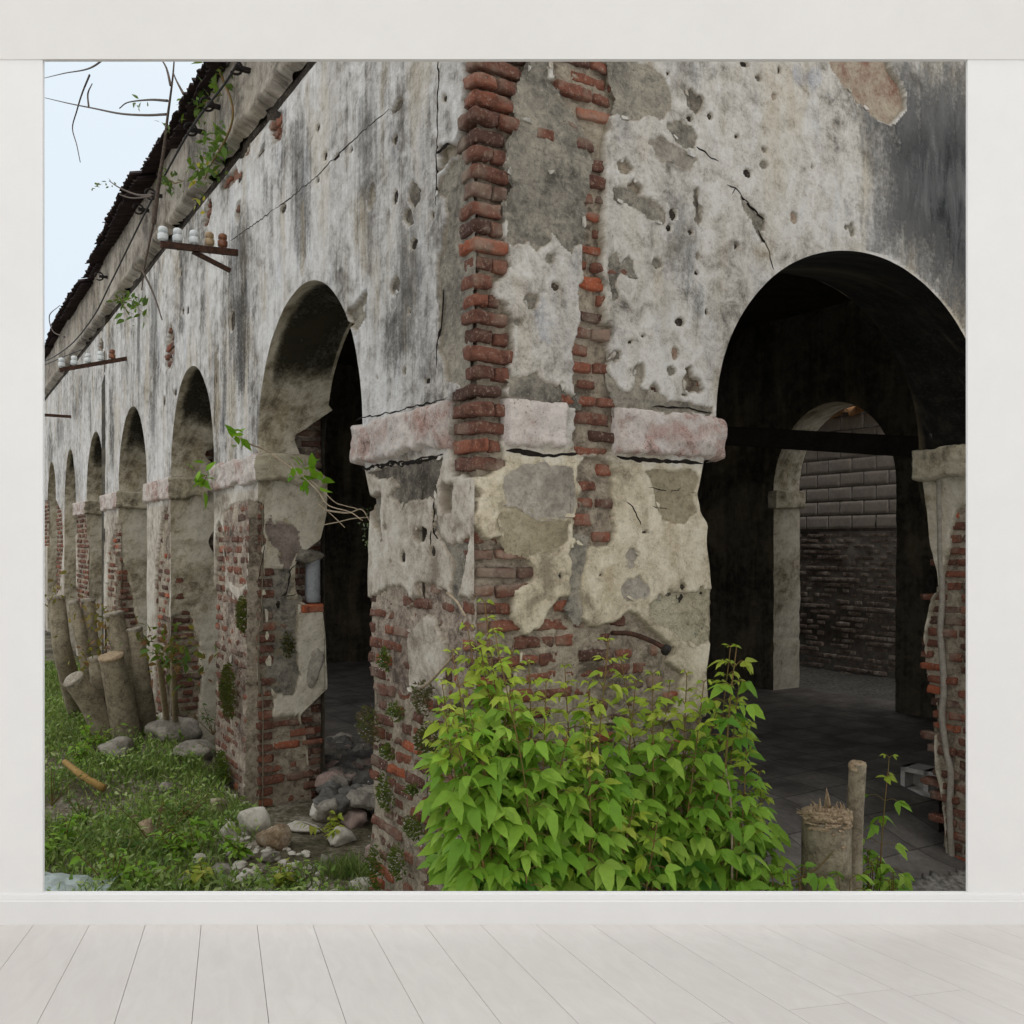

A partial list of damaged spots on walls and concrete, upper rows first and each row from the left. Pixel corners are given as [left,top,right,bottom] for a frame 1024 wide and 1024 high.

flaking render [829,62,903,124]
crack [232,109,389,240]
crack [728,185,774,269]
leakage [860,62,966,317]
flaking render [295,418,322,472]
crack [356,397,447,421]
crack [362,454,443,471]
peeling [367,62,711,891]
crack [506,448,578,458]
flaking render [76,507,202,720]
flaking render [209,499,323,809]
flaking render [920,504,966,862]